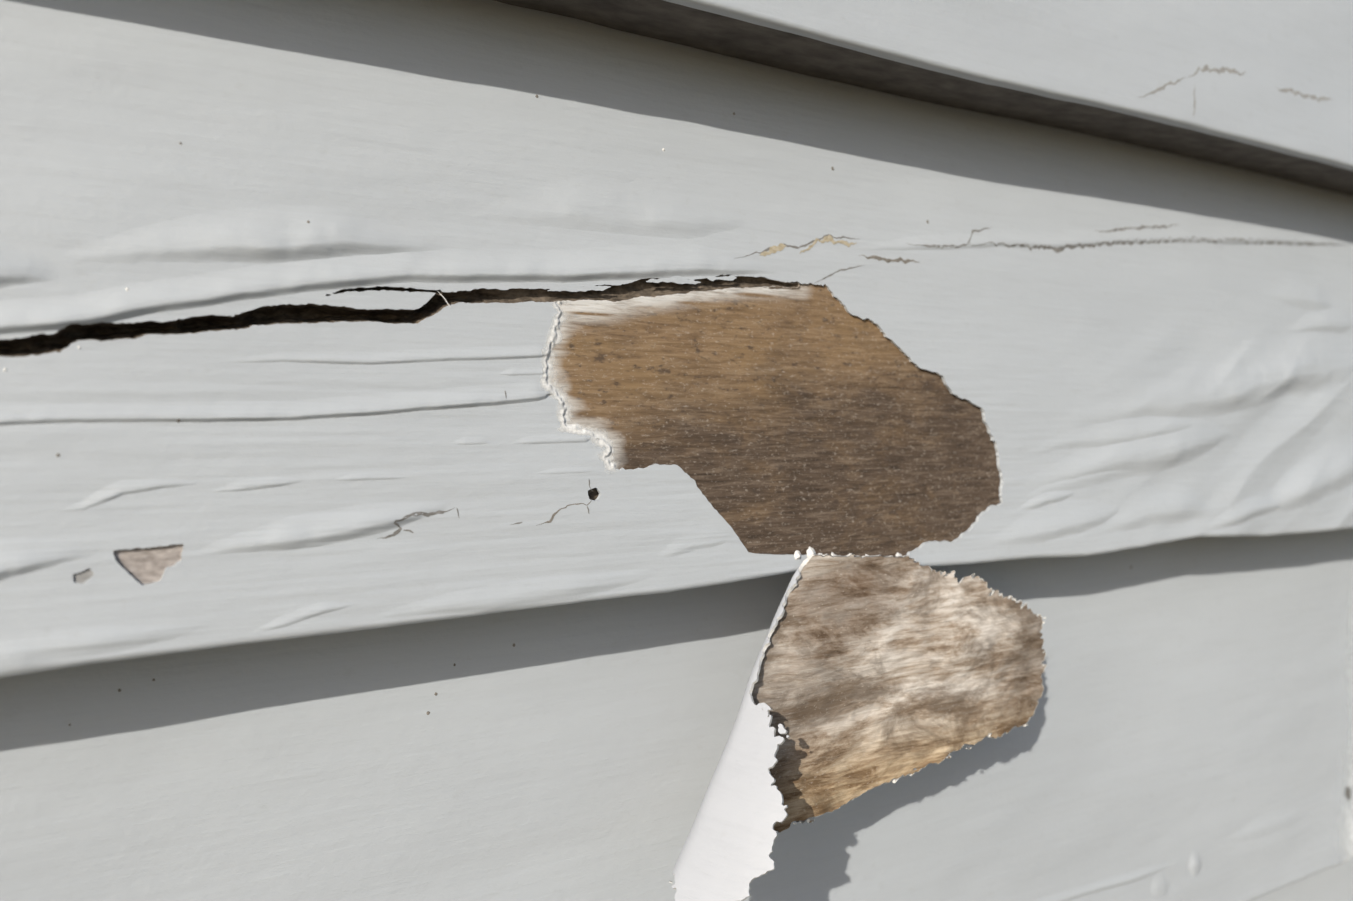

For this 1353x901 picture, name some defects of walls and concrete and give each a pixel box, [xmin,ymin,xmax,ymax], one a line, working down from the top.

crack [0,224,1345,357]
peeling [73,568,94,584]
peeling [113,544,183,584]
peeling [541,276,1047,901]